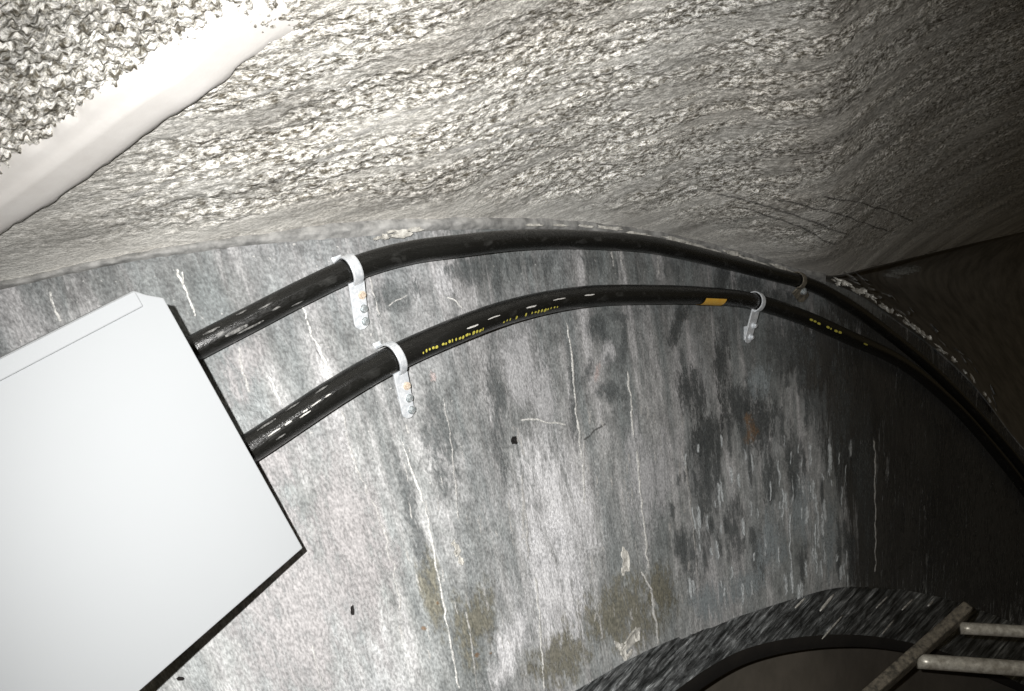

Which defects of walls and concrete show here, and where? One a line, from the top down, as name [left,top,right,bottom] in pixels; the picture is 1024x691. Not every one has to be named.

leakage [395,301,1024,690]